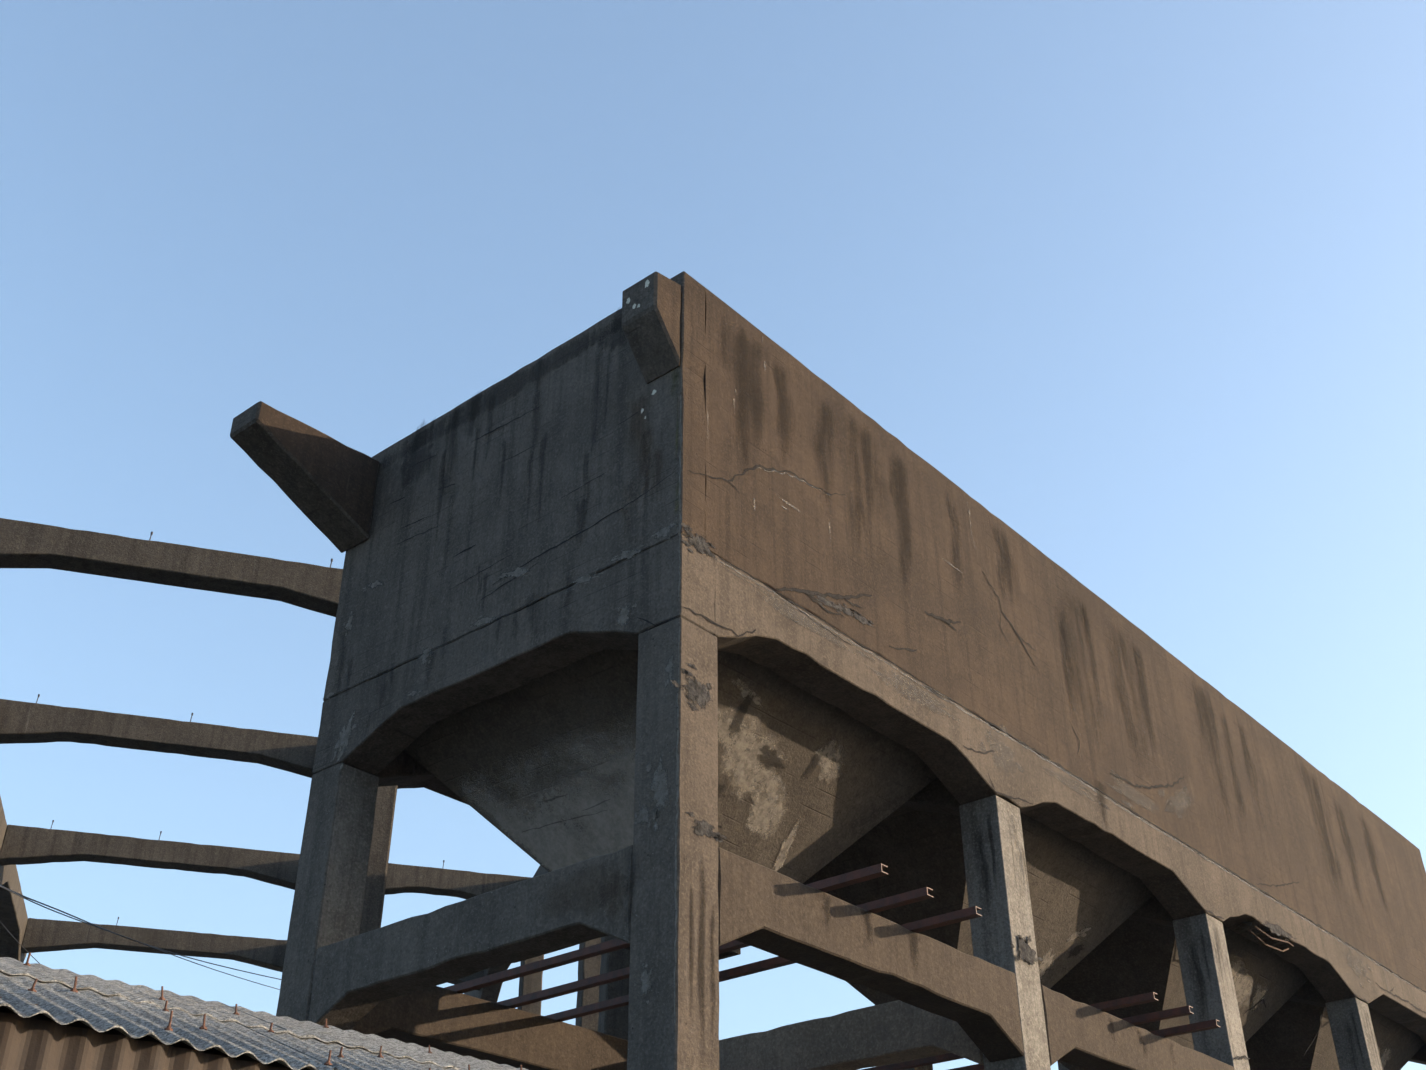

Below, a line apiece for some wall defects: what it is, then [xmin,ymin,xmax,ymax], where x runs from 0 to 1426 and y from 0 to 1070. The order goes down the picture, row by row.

crack [323,455,845,700]
peeling [670,663,797,871]
peeling [803,738,843,783]